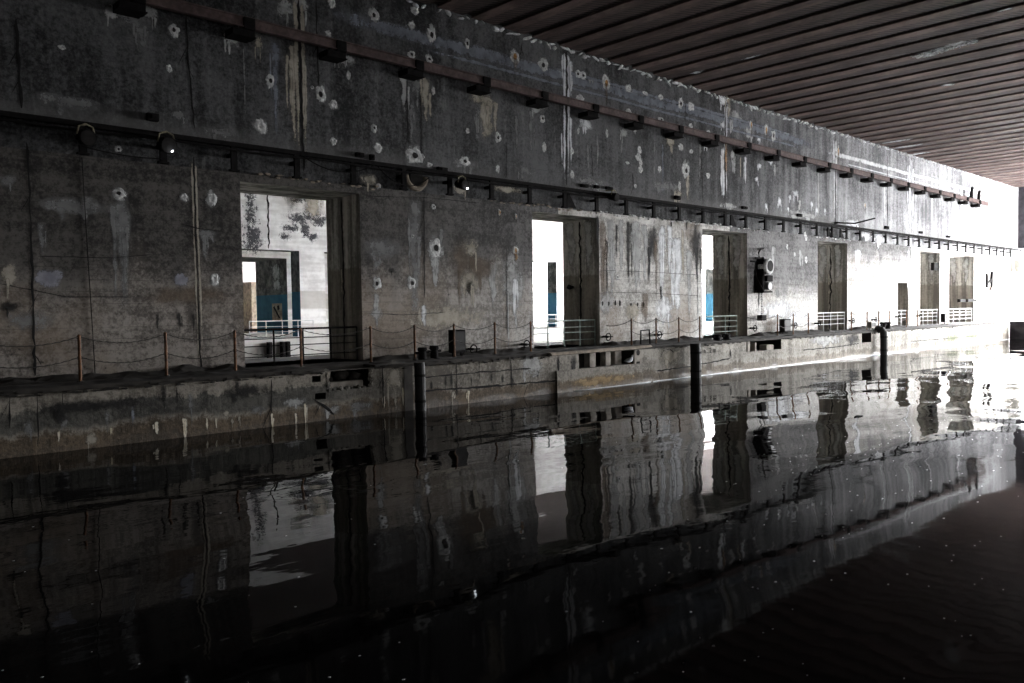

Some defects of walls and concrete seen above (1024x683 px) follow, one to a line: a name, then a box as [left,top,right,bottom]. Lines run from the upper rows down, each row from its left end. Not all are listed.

spalling [168,23,180,38]
leakage [277,0,308,26]
leakage [224,33,307,137]
spalling [310,86,338,109]
leakage [343,14,808,150]
spalling [406,0,1001,191]
spalling [112,187,127,201]
leakage [45,198,129,294]
spalling [428,238,444,258]
leakage [565,216,702,330]